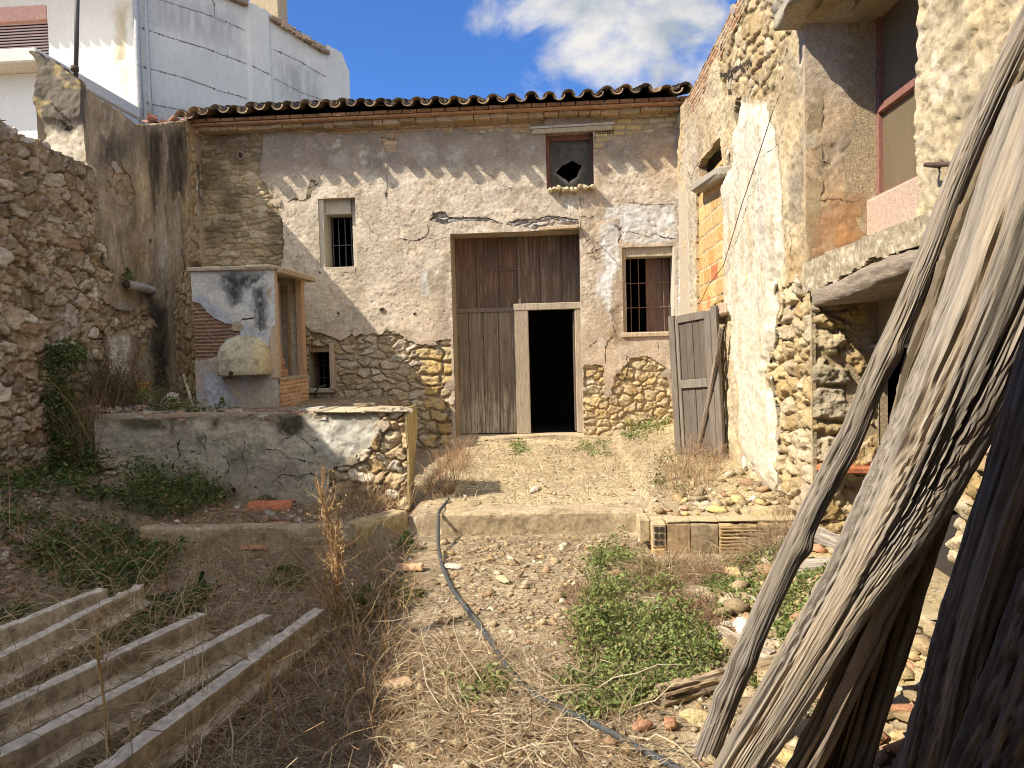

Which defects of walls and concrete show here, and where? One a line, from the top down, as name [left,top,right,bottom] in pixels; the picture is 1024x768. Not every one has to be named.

flaking render [283,119,547,154]
leakage [150,301,168,387]
leakage [150,133,184,273]
flaking render [142,112,284,408]
leakage [223,274,264,331]
crack [579,195,677,255]
crack [171,430,318,491]
flaking render [305,325,456,515]
flaking render [580,356,674,436]
flaking render [764,273,817,518]